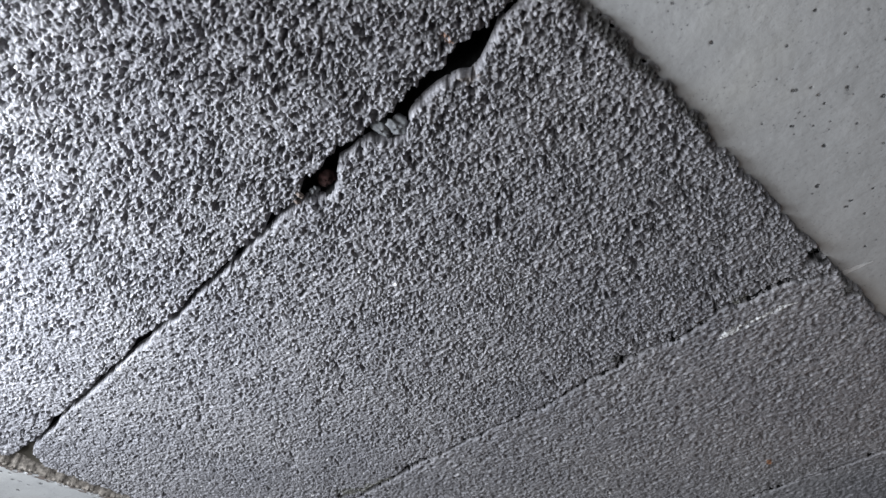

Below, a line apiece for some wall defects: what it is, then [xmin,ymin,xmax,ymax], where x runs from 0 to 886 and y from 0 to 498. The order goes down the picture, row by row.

crack [76,0,518,400]
crack [38,414,61,437]